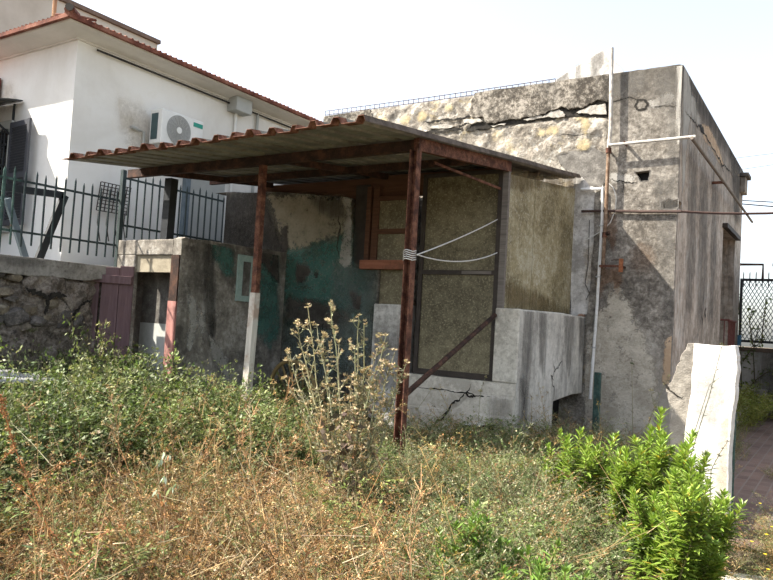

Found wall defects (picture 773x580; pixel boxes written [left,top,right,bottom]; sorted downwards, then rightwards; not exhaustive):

crack [419,93,735,182]
flaking render [702,125,723,165]